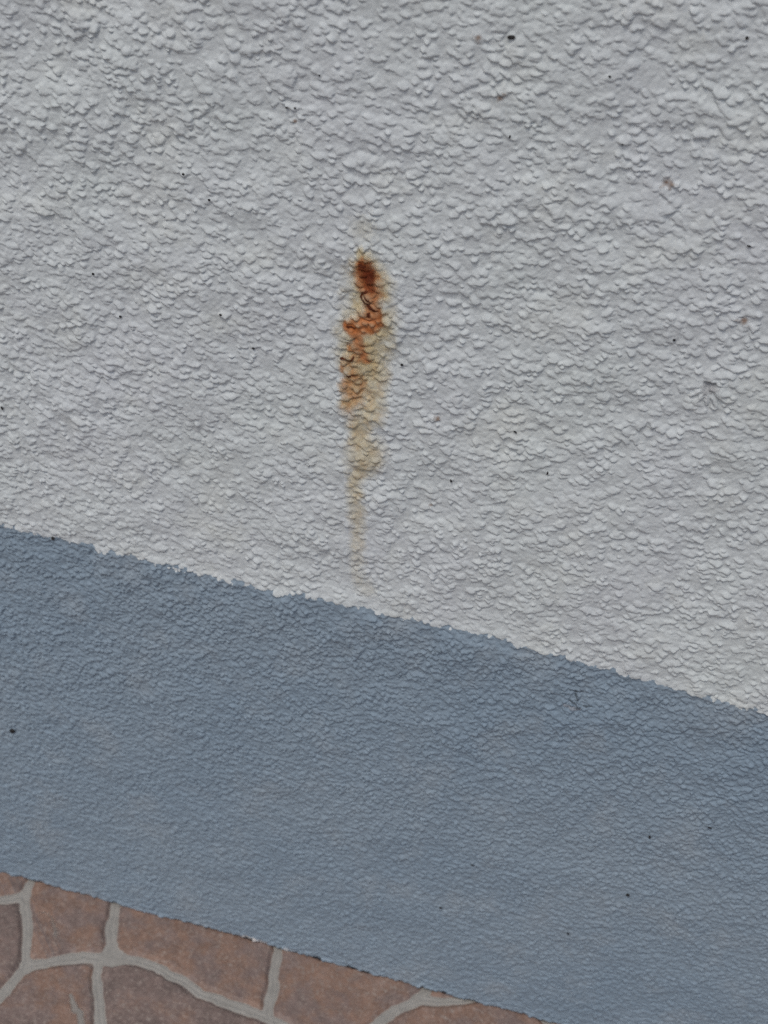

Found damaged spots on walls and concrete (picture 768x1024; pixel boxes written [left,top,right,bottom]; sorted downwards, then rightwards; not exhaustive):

rust [340,250,389,479]